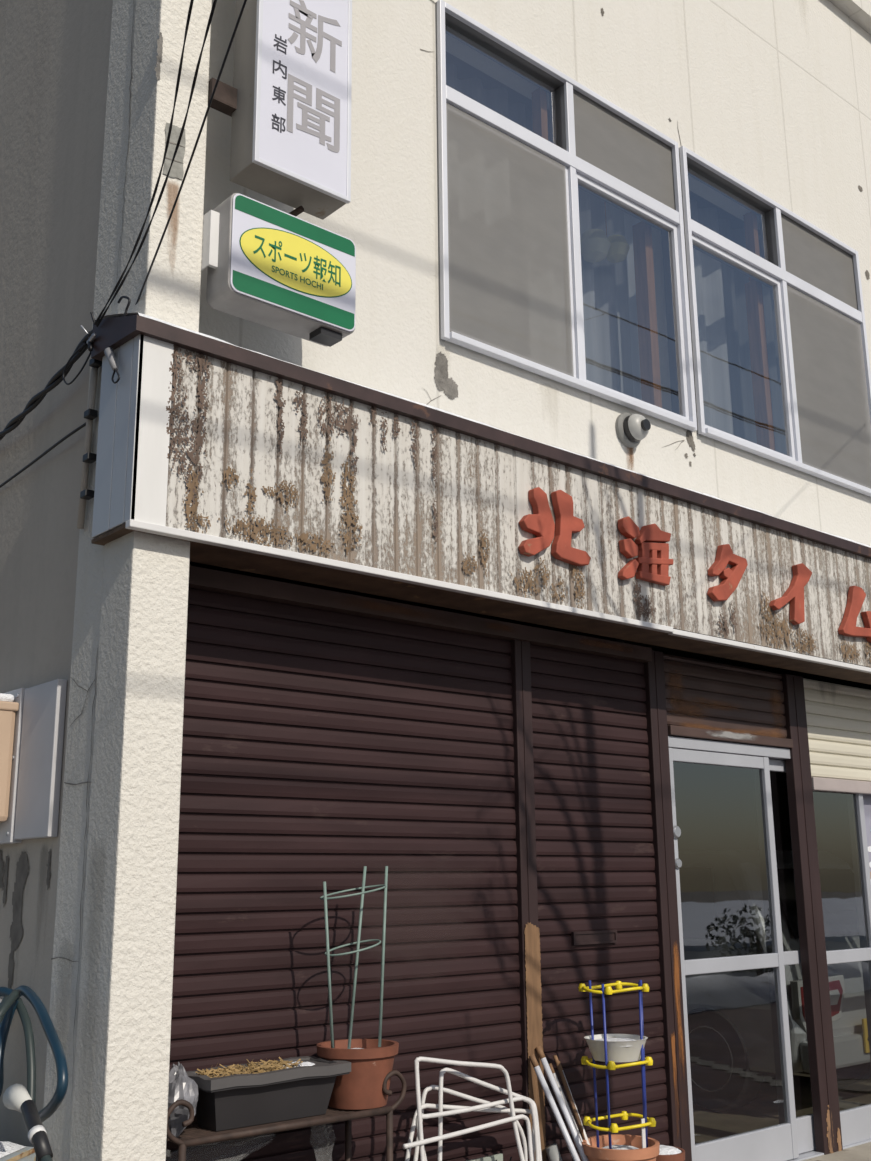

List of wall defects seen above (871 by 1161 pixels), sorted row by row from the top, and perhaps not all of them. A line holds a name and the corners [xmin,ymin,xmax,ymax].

peeling [434,352,458,400]
corrosion [714,729,752,739]
peeling [0,850,29,988]
crack [51,648,98,1098]